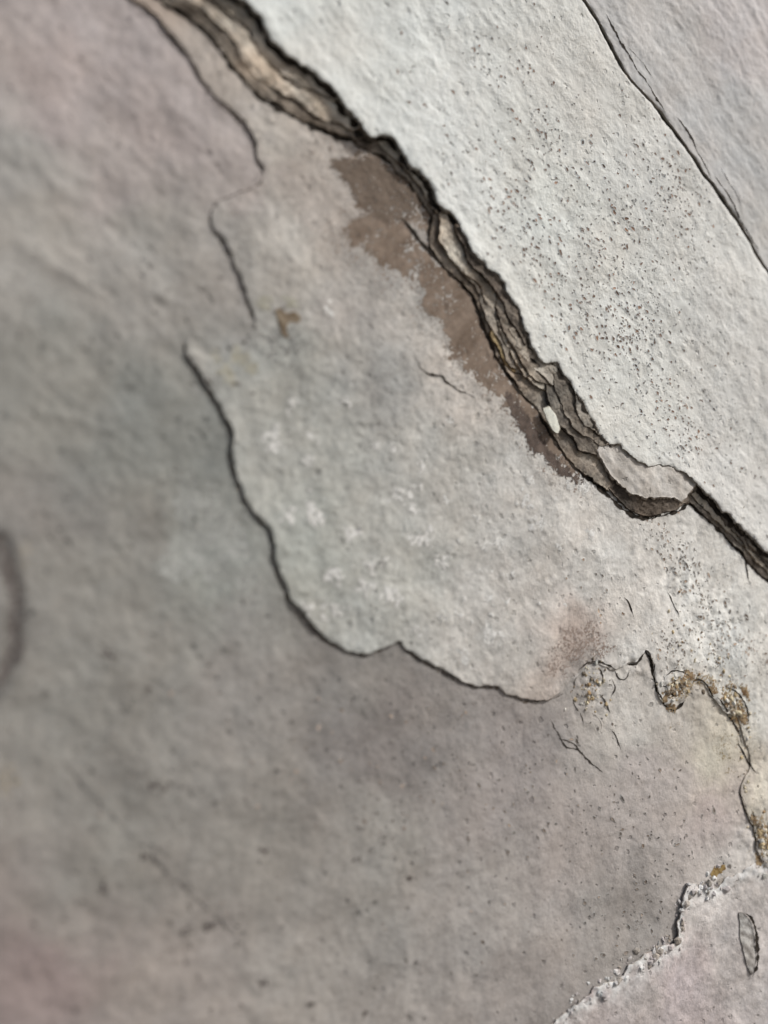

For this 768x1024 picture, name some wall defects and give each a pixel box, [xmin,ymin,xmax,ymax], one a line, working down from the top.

crack [128,0,768,582]
leakage [312,137,595,533]
leakage [262,394,301,463]
peeling [132,0,768,869]
leakage [278,489,325,531]
leakage [300,601,356,622]
leakage [324,555,413,609]
leakage [381,460,450,579]
crack [183,345,756,773]
crack [738,792,760,846]
peeling [552,863,768,1024]